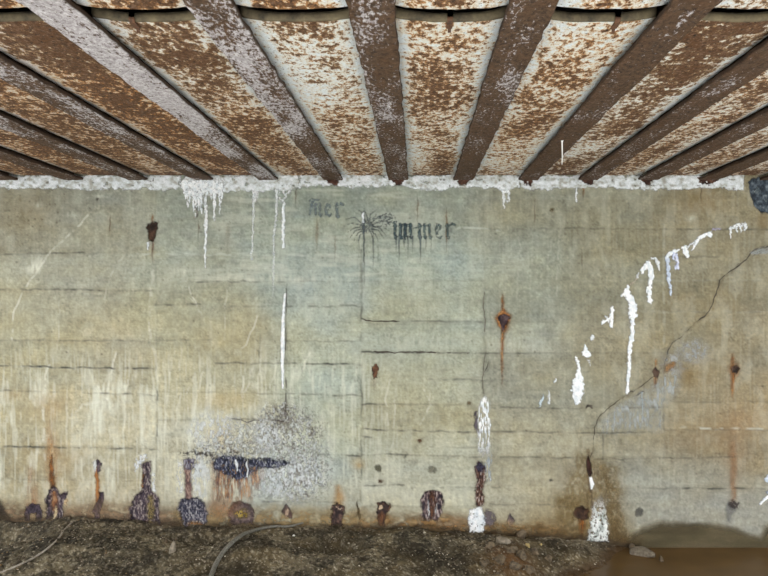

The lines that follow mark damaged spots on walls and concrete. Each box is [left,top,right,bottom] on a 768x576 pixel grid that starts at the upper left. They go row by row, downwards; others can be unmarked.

water stain [0,174,744,267]
water stain [570,335,594,405]
water stain [601,306,615,328]
water stain [620,228,719,394]
crack [589,246,768,460]
water stain [0,503,132,523]
spalling [129,454,160,523]
spalling [177,404,322,526]
spalling [420,490,444,521]
water stain [201,460,768,548]